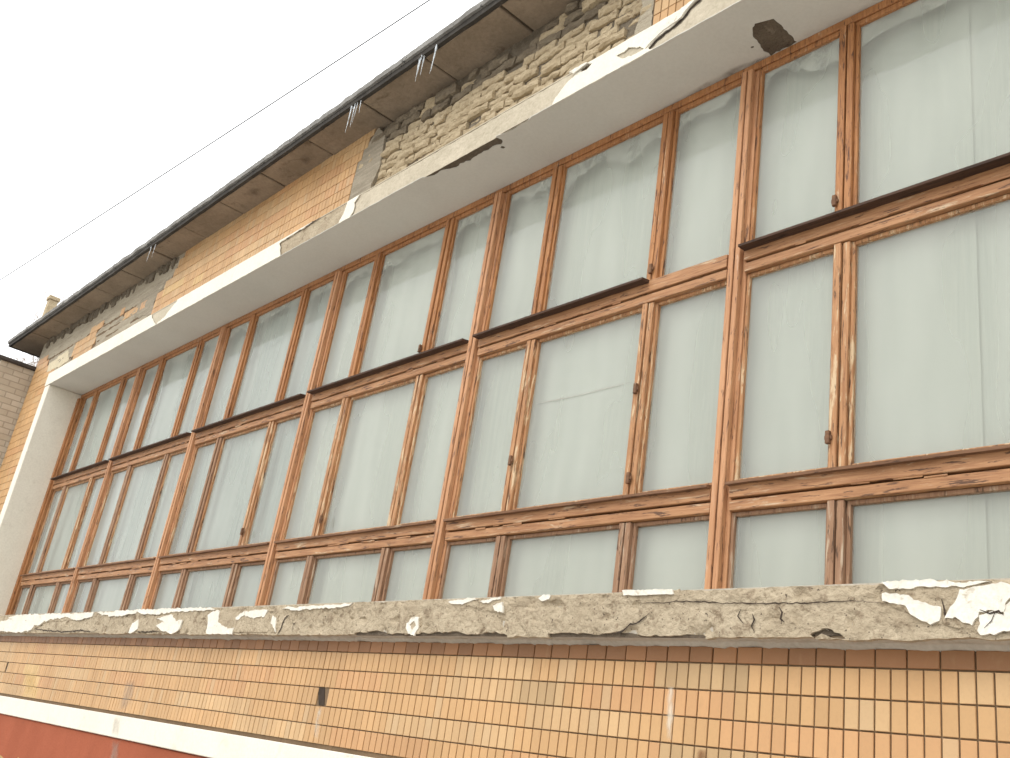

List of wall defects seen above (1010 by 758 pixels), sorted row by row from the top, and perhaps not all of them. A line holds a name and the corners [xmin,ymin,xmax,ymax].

spalling [751,19,796,55]
peeling [281,0,739,255]
peeling [38,252,186,372]
peeling [0,603,353,635]
crack [613,600,884,634]
peeling [879,579,1010,636]